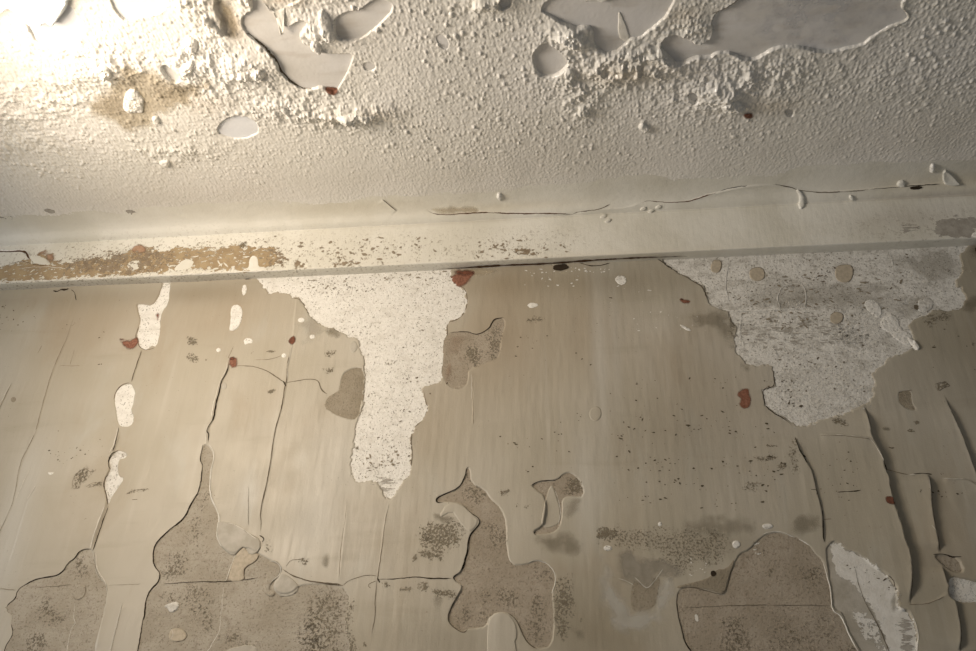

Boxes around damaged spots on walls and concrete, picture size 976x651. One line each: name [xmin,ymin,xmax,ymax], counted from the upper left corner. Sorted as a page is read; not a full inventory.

peeling [137,445,349,651]
spalling [0,243,505,504]
crack [205,344,327,542]
rust [451,270,474,287]
peeling [436,467,556,651]
crack [433,204,612,223]
rust [738,389,751,408]
peeling [597,522,919,651]
spalling [662,215,976,427]
crack [795,438,860,542]
crack [773,180,937,209]
crack [821,406,975,605]